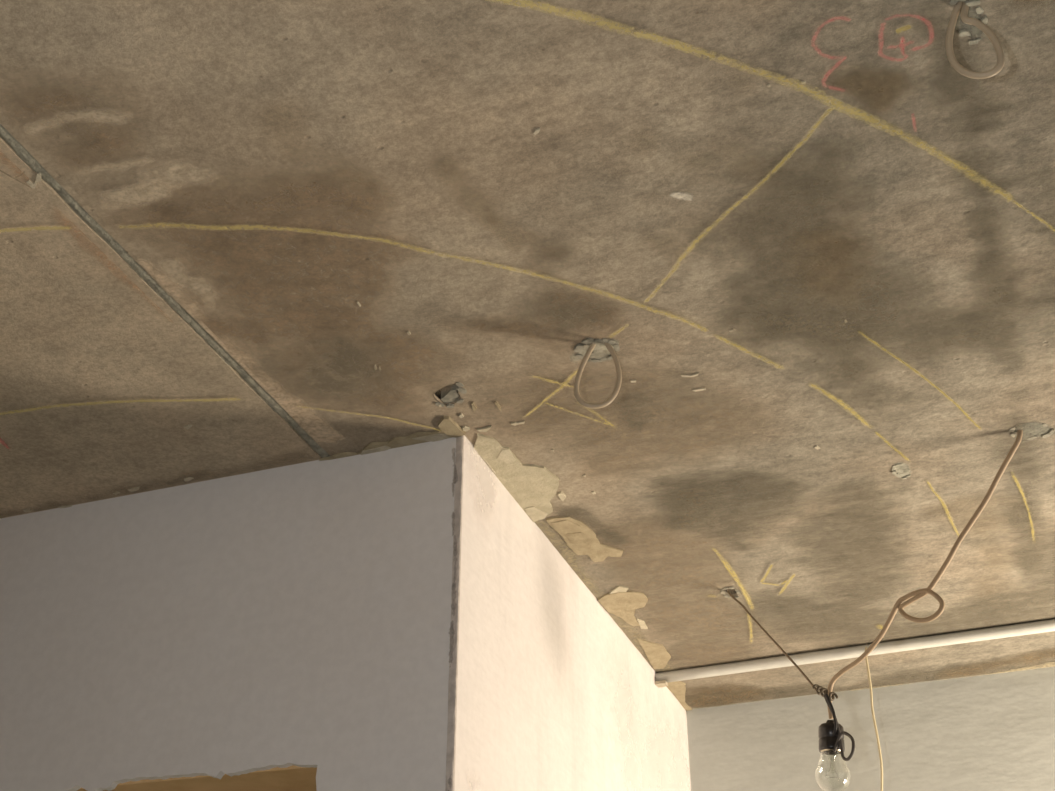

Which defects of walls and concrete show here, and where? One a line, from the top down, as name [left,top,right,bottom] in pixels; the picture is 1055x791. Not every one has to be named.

leakage [13,89,442,410]
leakage [724,153,1055,398]
leakage [514,370,746,471]
peeling [598,585,671,669]
peeling [666,681,692,711]
leakage [559,439,1055,666]